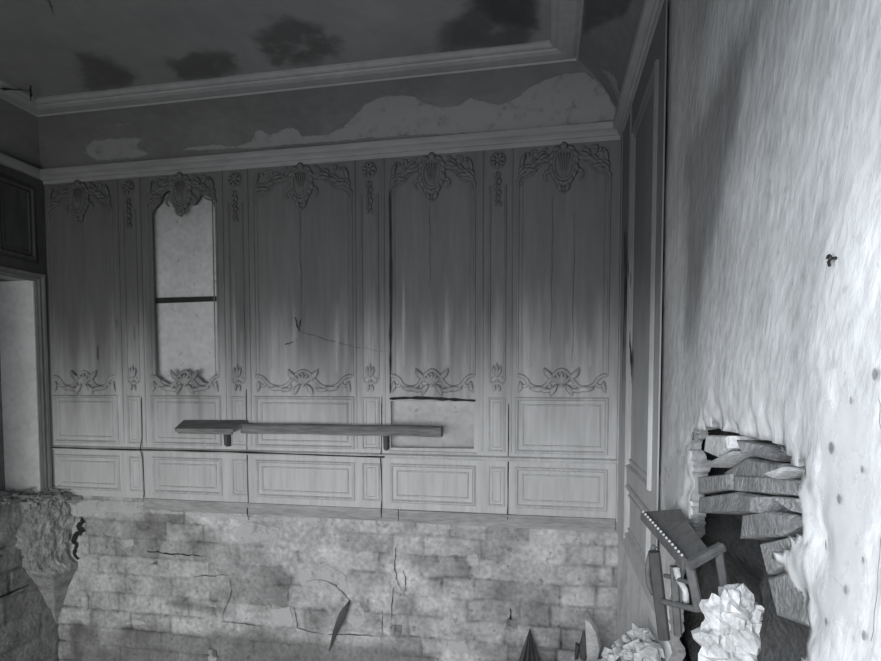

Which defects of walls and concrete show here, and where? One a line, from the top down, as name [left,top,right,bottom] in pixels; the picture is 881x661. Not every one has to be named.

peeling [81,123,149,161]
peeling [183,72,616,151]
spalling [698,435,815,627]